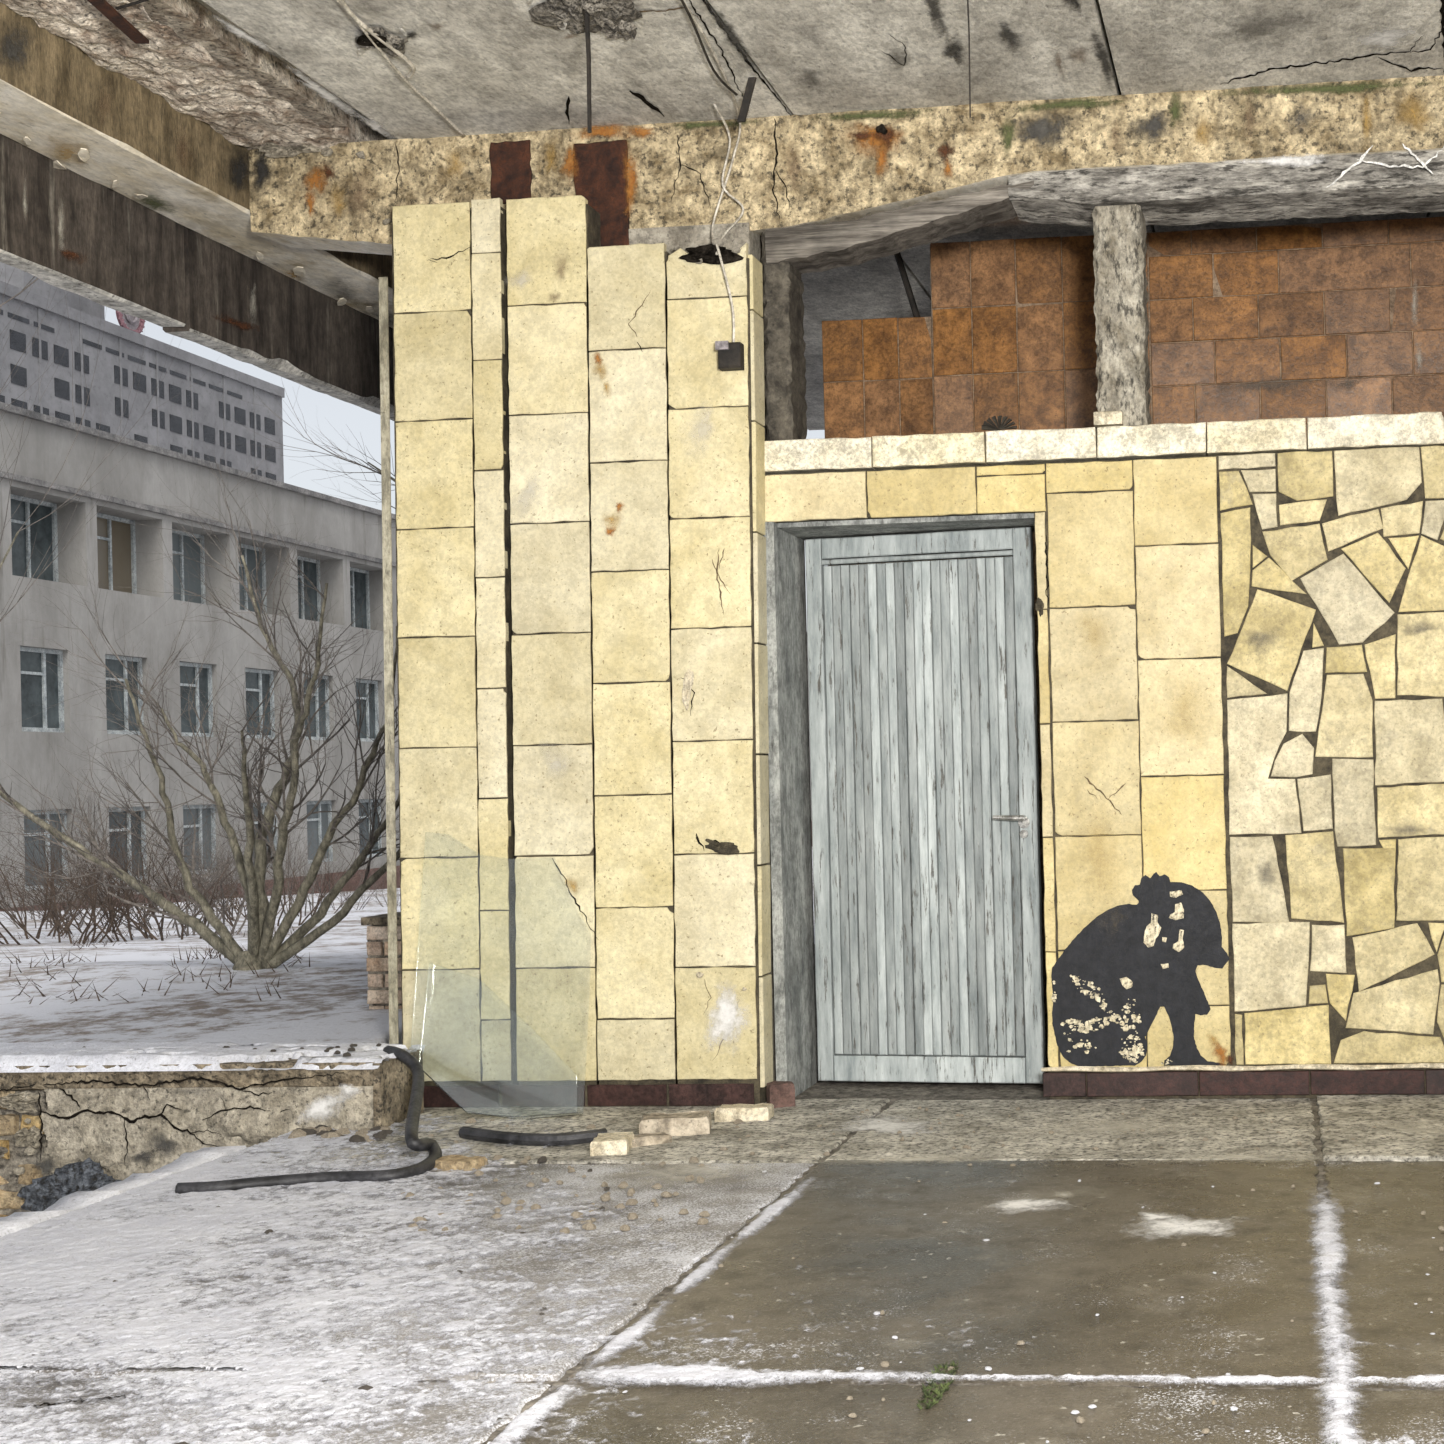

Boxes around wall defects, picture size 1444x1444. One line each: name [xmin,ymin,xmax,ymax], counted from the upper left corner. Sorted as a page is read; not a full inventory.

spalling [355,27,417,58]
spalling [527,0,700,41]
crack [1221,0,1444,84]
corrosion [562,125,650,176]
corrosion [853,124,896,173]
corrosion [625,158,637,210]
spalling [673,238,744,265]
crack [0,1072,344,1163]